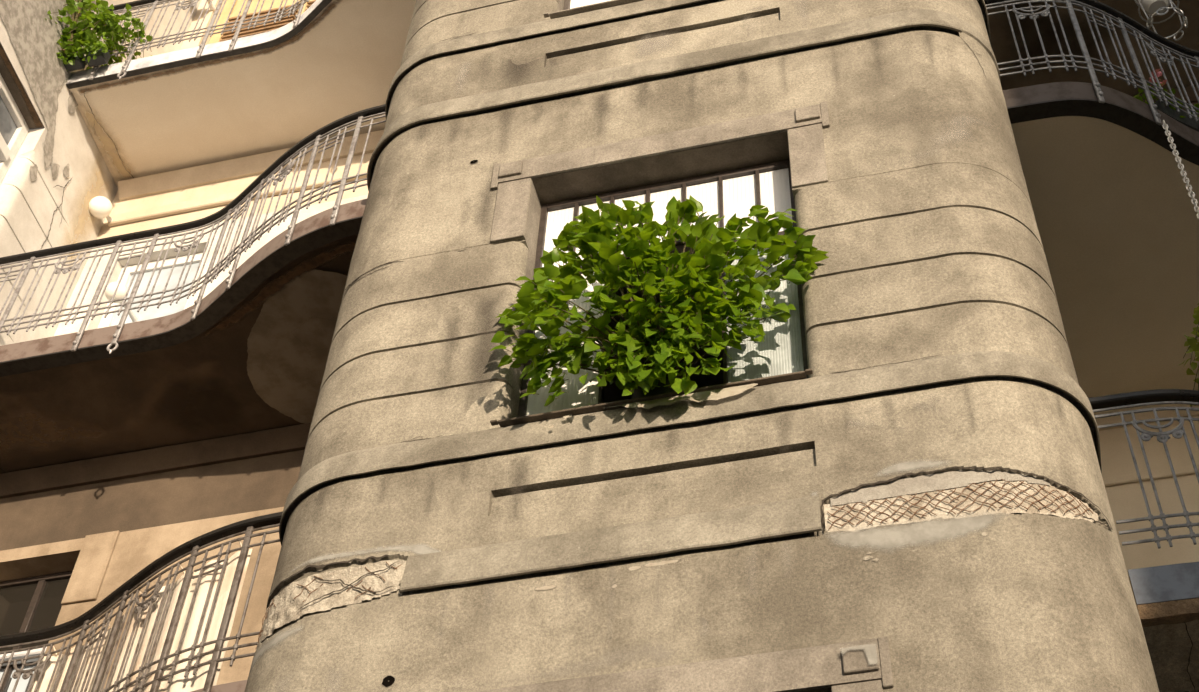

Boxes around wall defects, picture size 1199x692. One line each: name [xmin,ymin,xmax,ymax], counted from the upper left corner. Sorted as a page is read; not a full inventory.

peeling [206,241,356,334]
spalling [812,461,1113,561]
spalling [249,545,440,673]